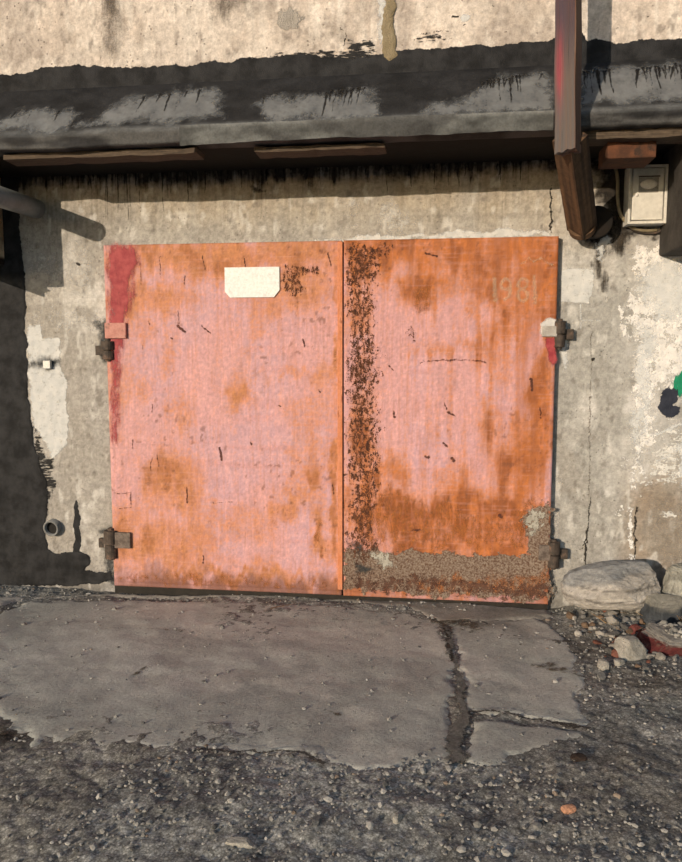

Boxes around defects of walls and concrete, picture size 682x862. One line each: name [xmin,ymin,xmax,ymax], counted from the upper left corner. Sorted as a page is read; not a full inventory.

leakage [107,0,115,51]
corrosion [280,264,319,296]
peeling [620,240,682,497]
corrosion [337,241,555,604]
crack [582,459,591,565]
peeling [627,507,636,560]
crack [443,627,591,764]